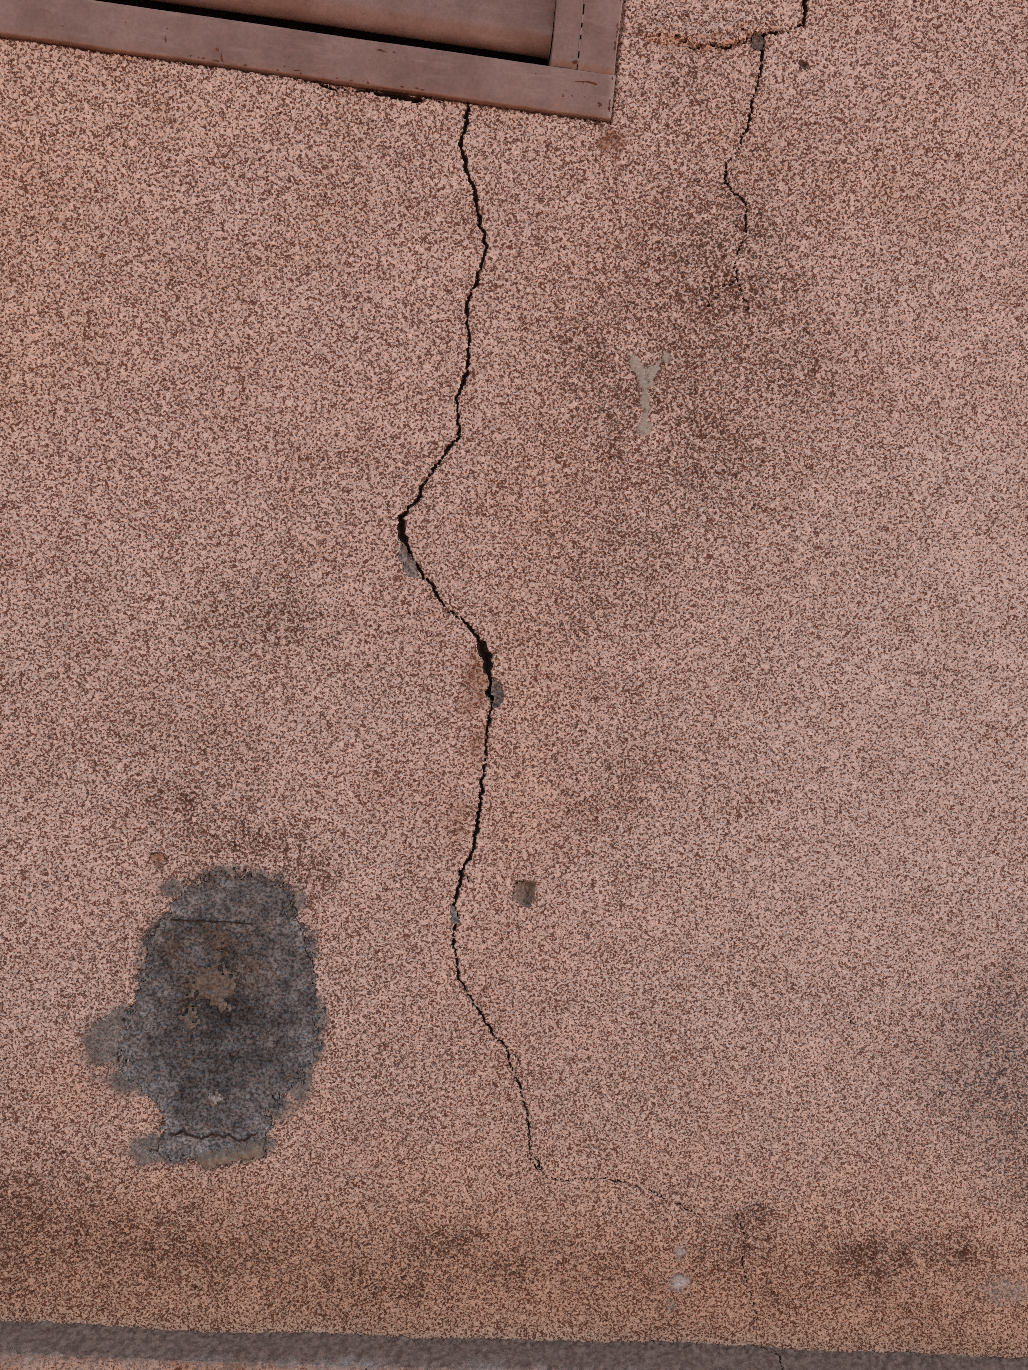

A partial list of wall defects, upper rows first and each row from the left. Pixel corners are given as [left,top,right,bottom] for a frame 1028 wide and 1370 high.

crack [678,0,808,310]
crack [397,102,695,1213]
spalling [83,866,328,1171]